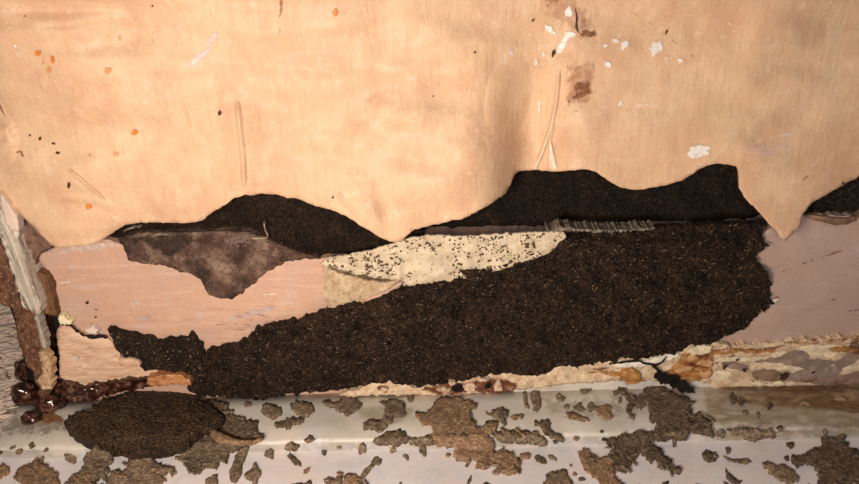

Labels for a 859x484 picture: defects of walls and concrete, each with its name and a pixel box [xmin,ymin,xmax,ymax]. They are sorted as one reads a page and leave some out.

spalling [803,210,859,226]
peeling [362,280,403,304]
peeling [57,322,158,385]
peeling [686,331,859,389]
peeling [273,348,688,447]